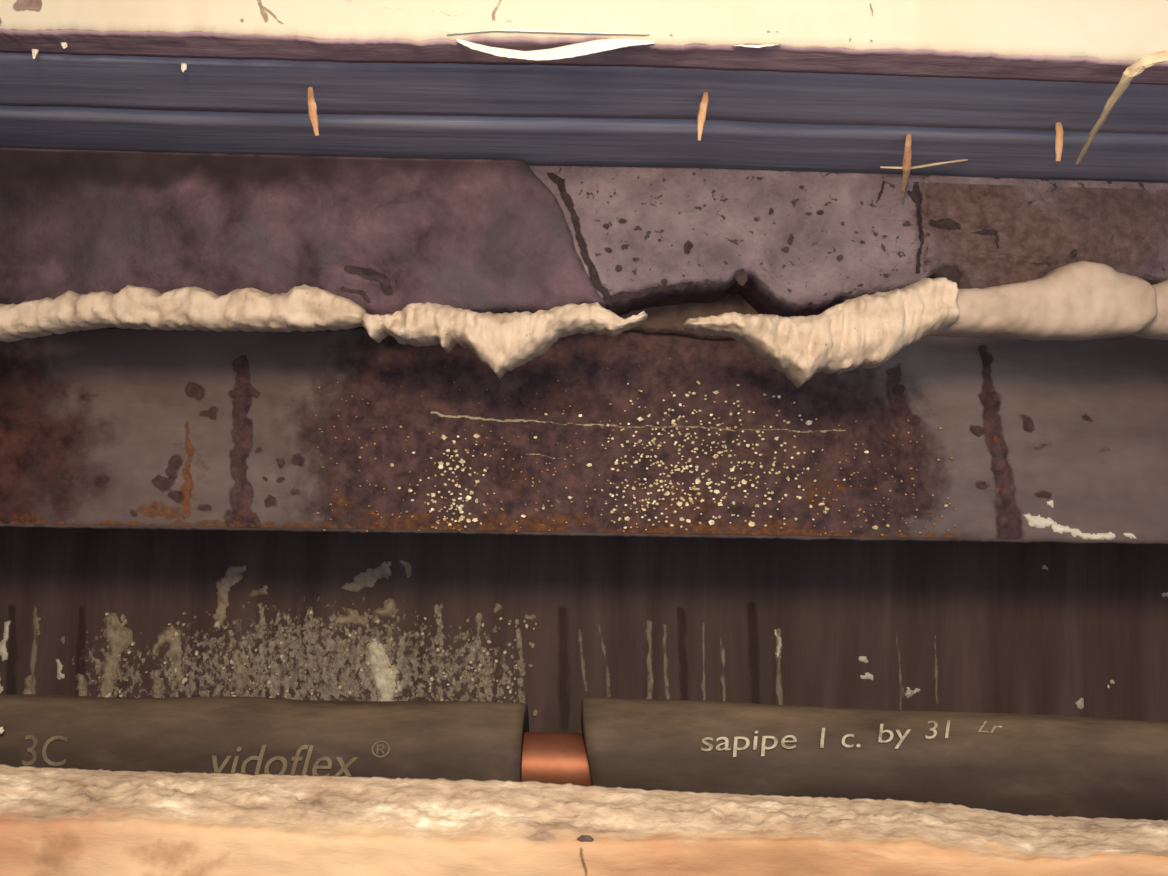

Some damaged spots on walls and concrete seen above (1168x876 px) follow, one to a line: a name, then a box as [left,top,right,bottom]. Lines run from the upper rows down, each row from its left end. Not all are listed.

peeling [13,0,42,11]
crack [547,173,694,304]
crack [876,181,999,274]
rust [119,332,955,538]
damp [526,420,846,433]
rust [970,345,1022,539]
rust [1022,415,1034,432]
damp [56,560,538,716]
damp [560,609,587,726]
crack [579,848,587,876]